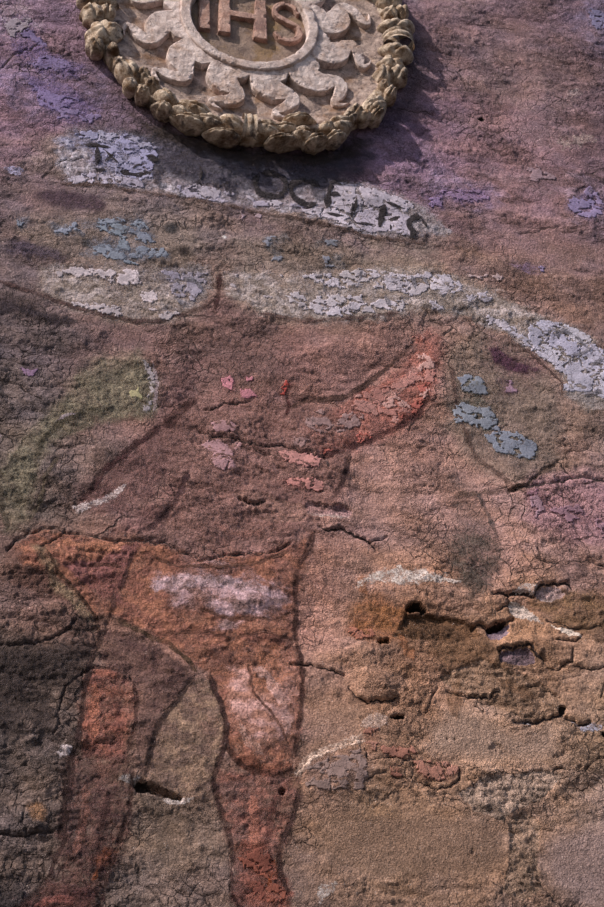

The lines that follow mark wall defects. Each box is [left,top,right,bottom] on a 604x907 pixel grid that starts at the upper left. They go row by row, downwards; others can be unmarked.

crack [510,462,604,492]
crack [320,527,385,551]
spalling [535,586,565,603]
spalling [393,602,582,642]
spalling [440,647,565,720]
peeling [305,727,459,791]
spalling [459,769,564,901]